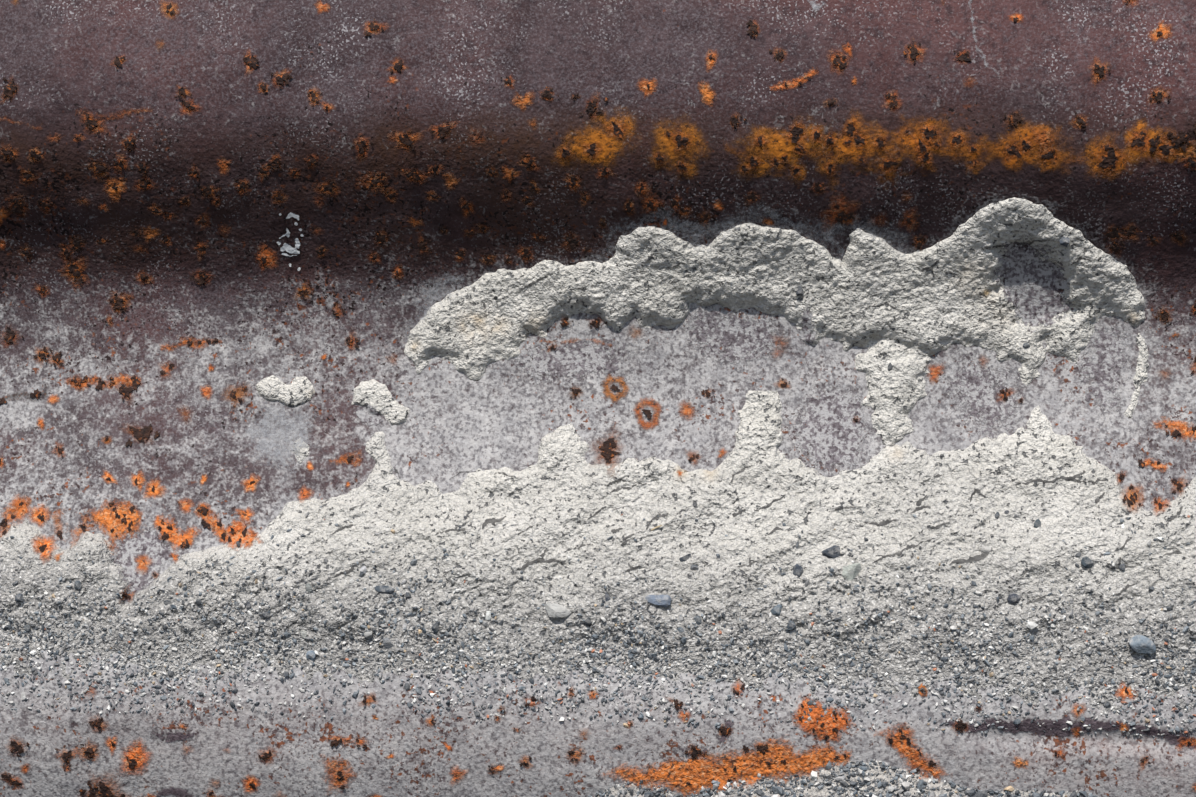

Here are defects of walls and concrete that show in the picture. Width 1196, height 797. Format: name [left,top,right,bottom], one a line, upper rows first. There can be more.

rust [730,116,898,197]
rust [1089,122,1196,175]
rust [598,438,621,463]
rust [603,376,628,402]
rust [634,399,661,429]
rust [1154,420,1196,438]
rust [0,499,258,561]
rust [1,741,30,786]
rust [55,717,148,771]
rust [327,736,367,790]
rust [604,697,851,796]
rust [880,725,943,778]